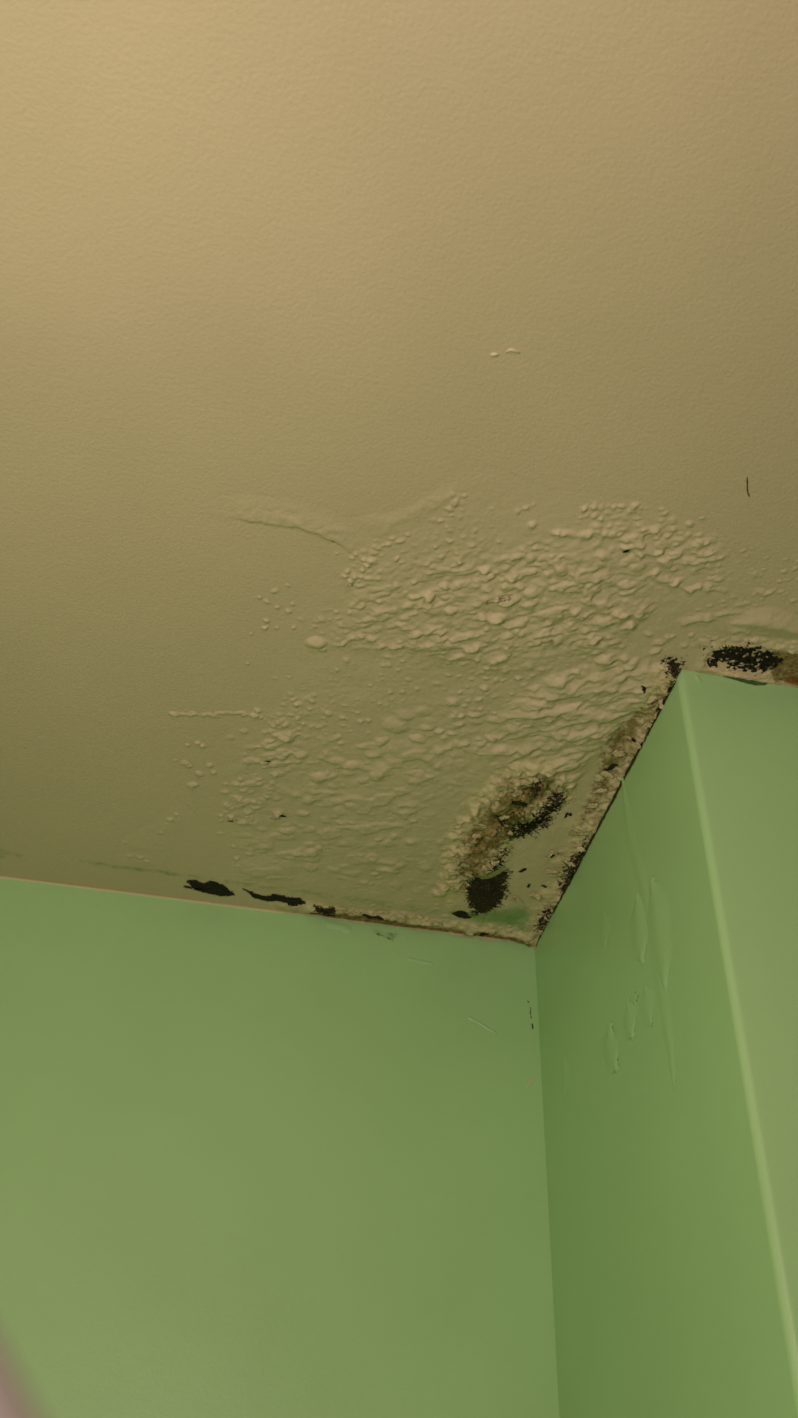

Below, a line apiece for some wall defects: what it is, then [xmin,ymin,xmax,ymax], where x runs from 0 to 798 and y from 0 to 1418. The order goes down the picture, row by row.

damp [184,640,798,947]